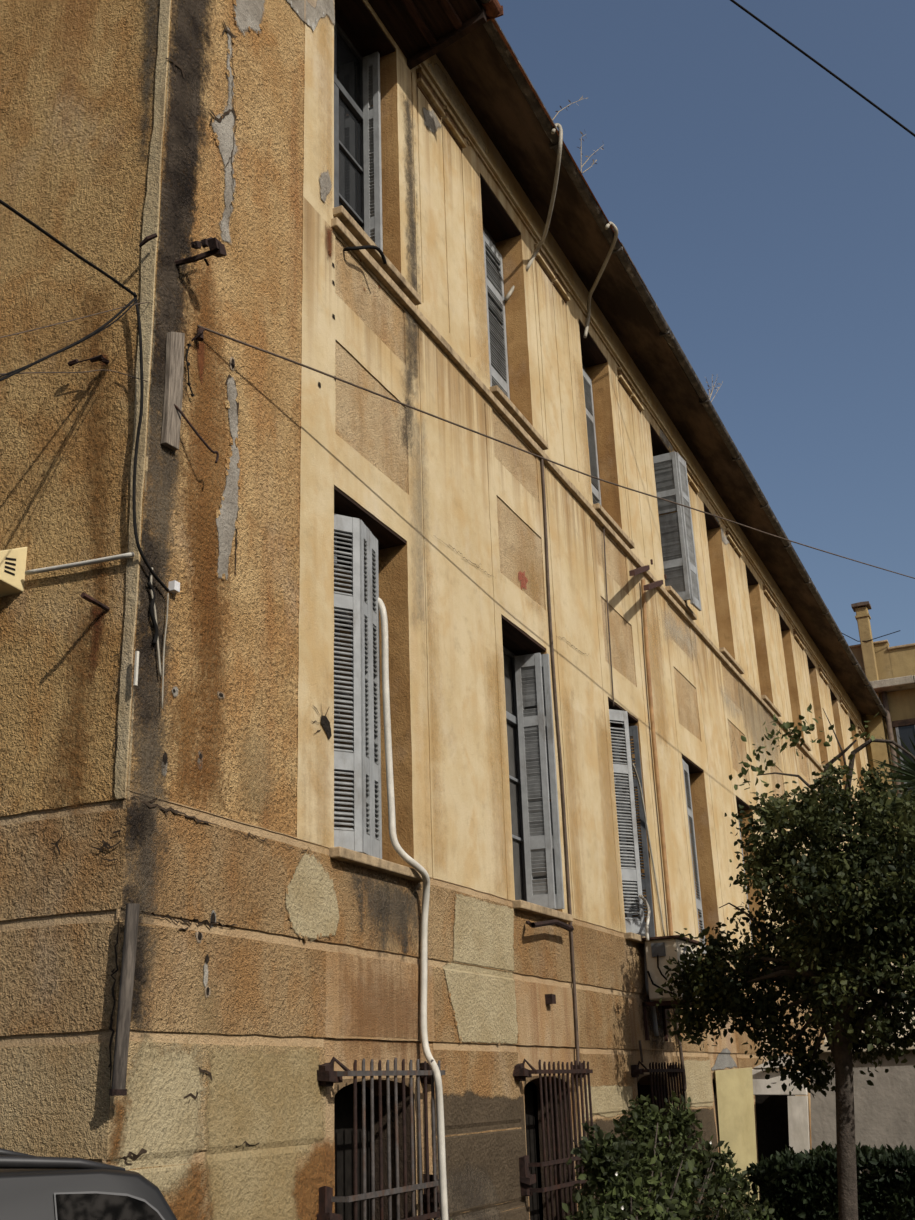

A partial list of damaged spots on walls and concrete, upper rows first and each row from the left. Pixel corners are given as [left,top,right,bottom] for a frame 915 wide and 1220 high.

flaking render [287,0,335,32]
flaking render [212,0,265,242]
flaking render [319,171,332,202]
damp [404,100,417,292]
damp [119,0,210,1036]
flaking render [215,357,241,580]
damp [403,313,418,446]
damp [353,873,420,956]